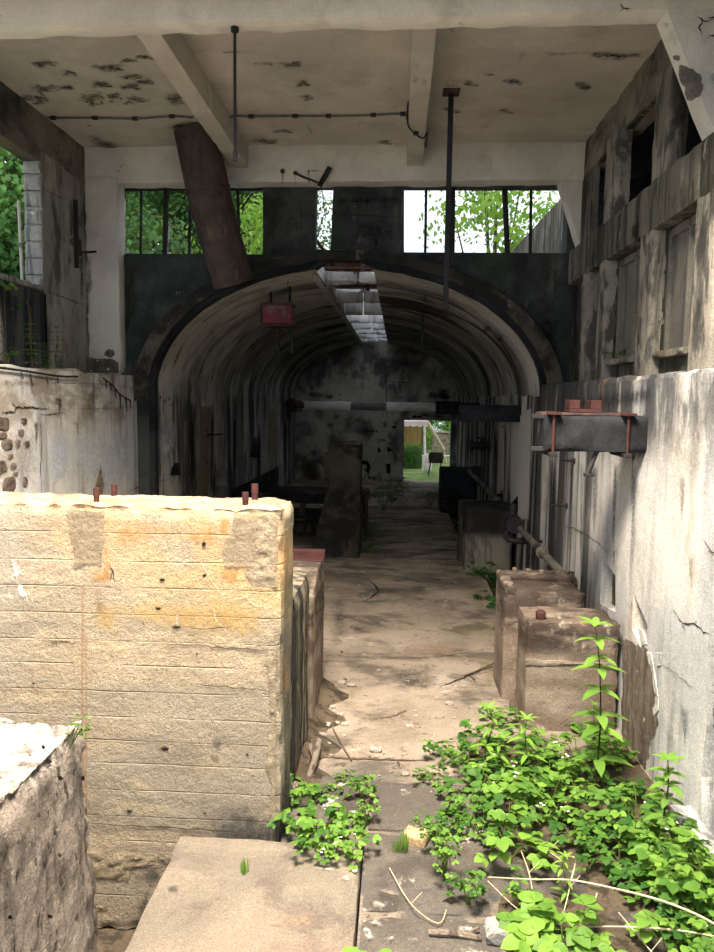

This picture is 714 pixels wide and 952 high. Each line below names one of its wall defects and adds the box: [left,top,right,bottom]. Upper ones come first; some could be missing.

crack [697,16,714,38]
damp [22,71,77,104]
damp [82,55,152,106]
peeling [673,55,703,101]
flaking render [0,418,31,492]
damp [7,564,28,599]